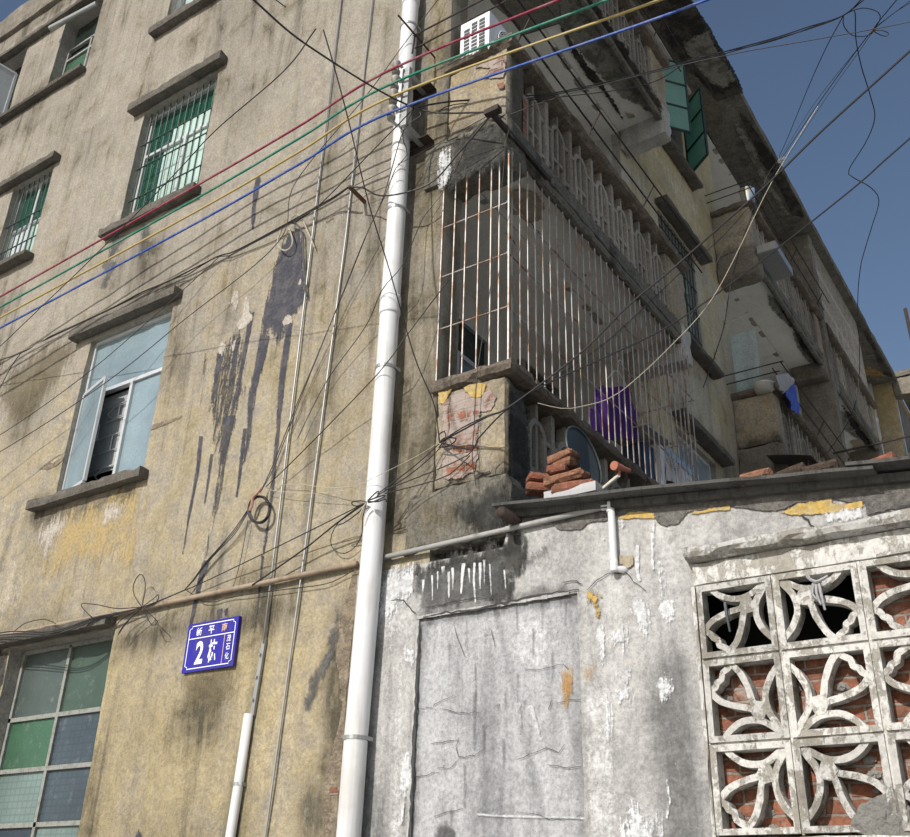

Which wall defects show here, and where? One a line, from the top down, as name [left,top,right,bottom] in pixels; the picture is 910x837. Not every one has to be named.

peeling [561,28,635,119]
peeling [587,0,664,111]
spalling [438,382,496,480]
water stain [378,390,547,625]
peeling [522,483,910,531]
crack [391,572,646,837]
water stain [435,826,455,837]